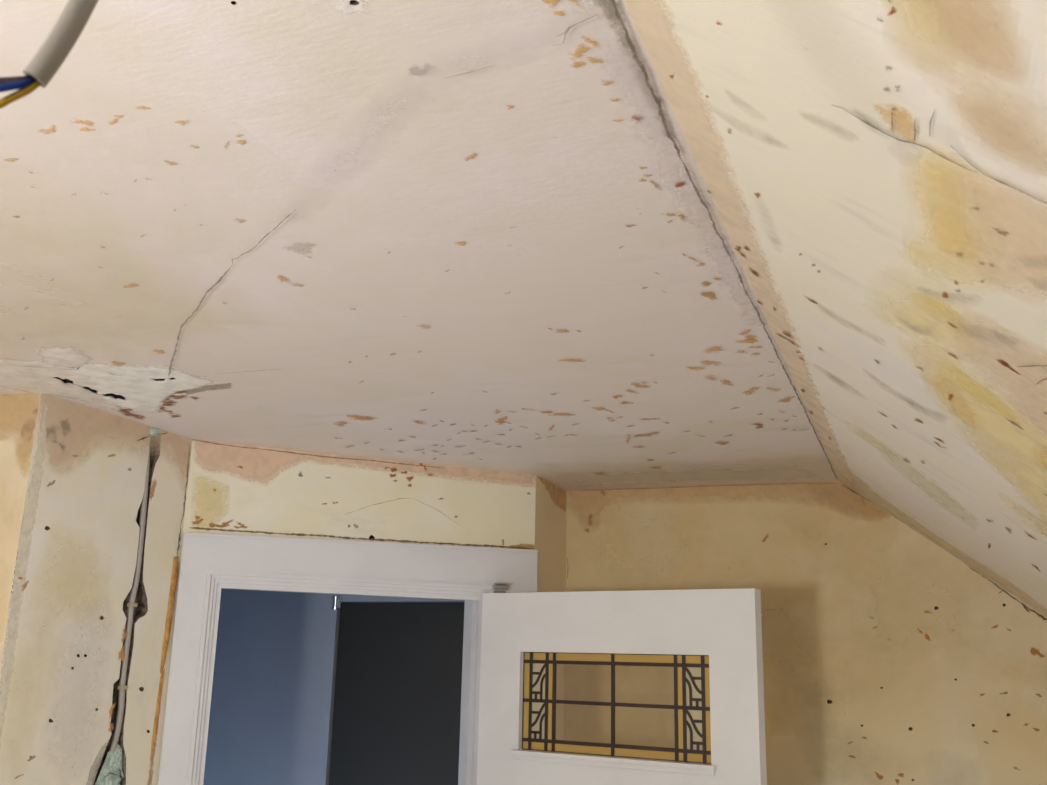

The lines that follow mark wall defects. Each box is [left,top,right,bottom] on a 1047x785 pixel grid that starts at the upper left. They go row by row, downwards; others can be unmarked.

leakage [876,106,914,141]
crack [833,105,1047,204]
crack [168,209,296,377]
crack [554,0,869,501]
spalling [0,347,212,419]
leakage [928,332,1047,534]
crack [968,566,1047,620]